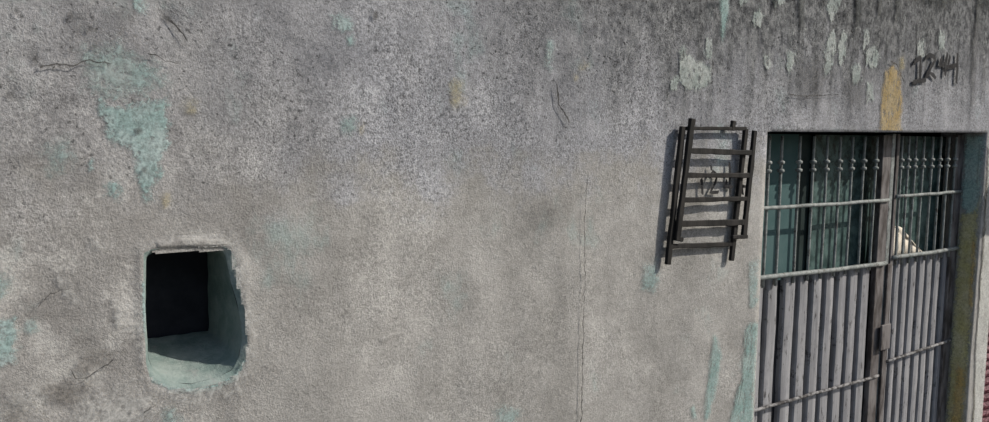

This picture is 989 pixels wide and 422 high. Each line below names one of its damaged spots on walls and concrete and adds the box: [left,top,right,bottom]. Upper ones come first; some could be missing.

peeling [721,0,748,34]
peeling [752,7,765,28]
peeling [671,37,713,93]
peeling [786,49,796,74]
peeling [823,0,879,103]
peeling [84,45,171,201]
crack [556,84,570,123]
crack [580,176,588,422]
peeling [731,323,758,422]
peeling [80,391,156,422]